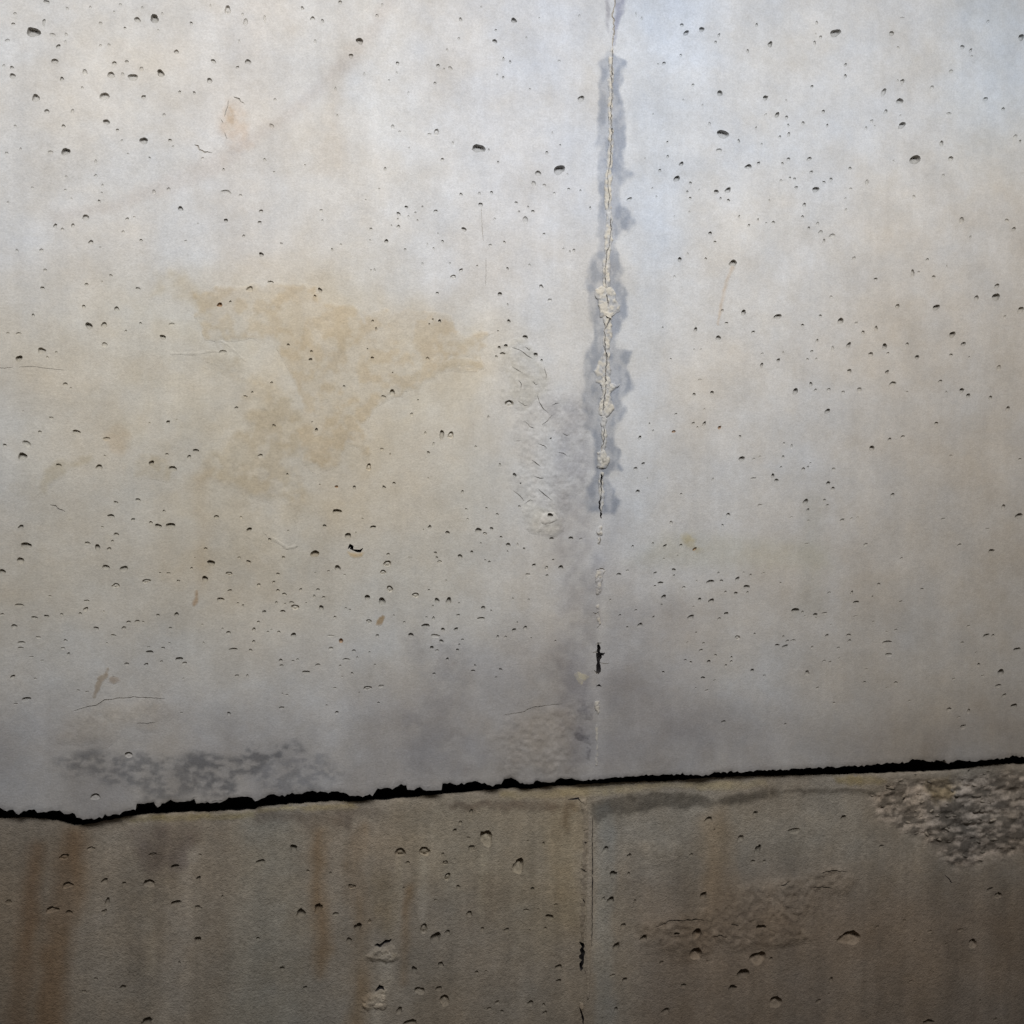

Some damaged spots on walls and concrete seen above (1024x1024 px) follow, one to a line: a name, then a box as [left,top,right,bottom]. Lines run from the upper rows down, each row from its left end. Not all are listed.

crack [603,0,616,409]
crack [596,440,604,570]
damp [385,0,889,836]
crack [593,643,608,687]
damp [45,733,389,1024]
damp [393,842,492,933]
crack [0,755,1024,972]
spalling [863,765,1024,876]